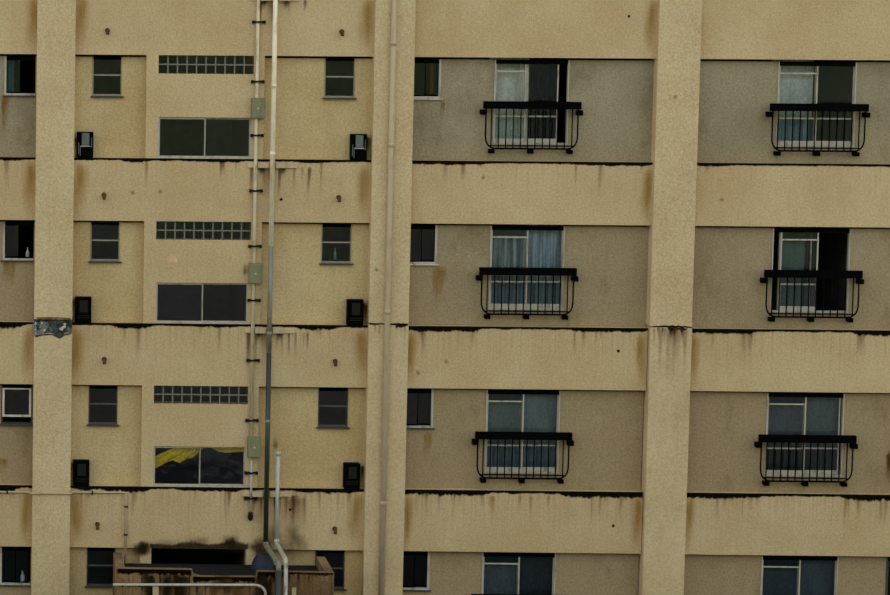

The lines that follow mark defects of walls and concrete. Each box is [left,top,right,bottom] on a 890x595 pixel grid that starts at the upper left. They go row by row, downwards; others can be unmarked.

spalling [34,317,72,338]
water stain [72,323,368,347]
water stain [405,489,643,498]